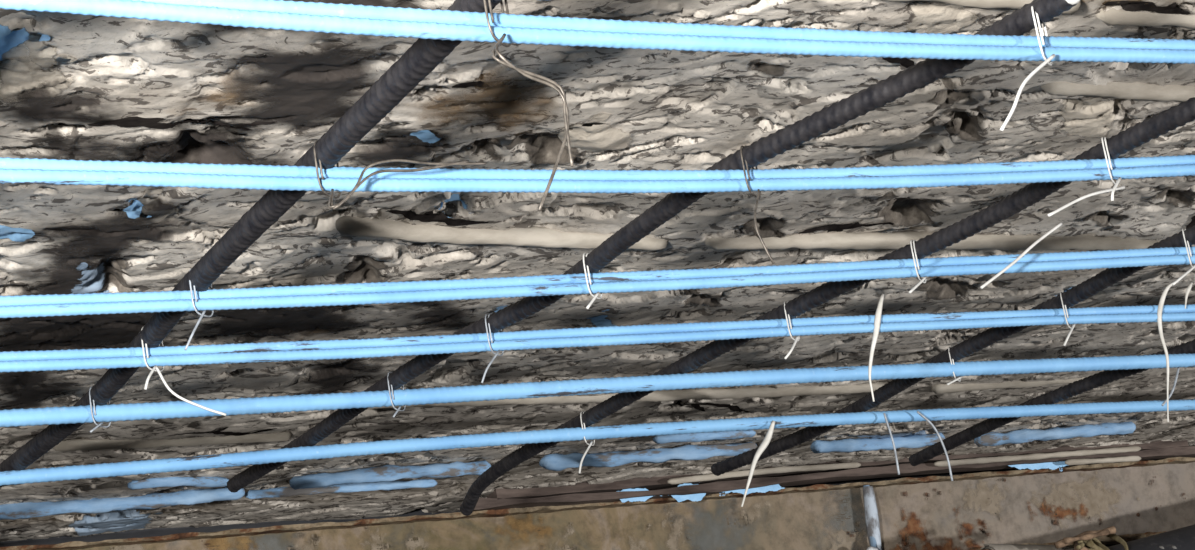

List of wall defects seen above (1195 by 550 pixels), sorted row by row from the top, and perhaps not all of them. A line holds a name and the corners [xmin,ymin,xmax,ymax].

corrosion [894,509,988,550]
corrosion [1029,500,1088,522]